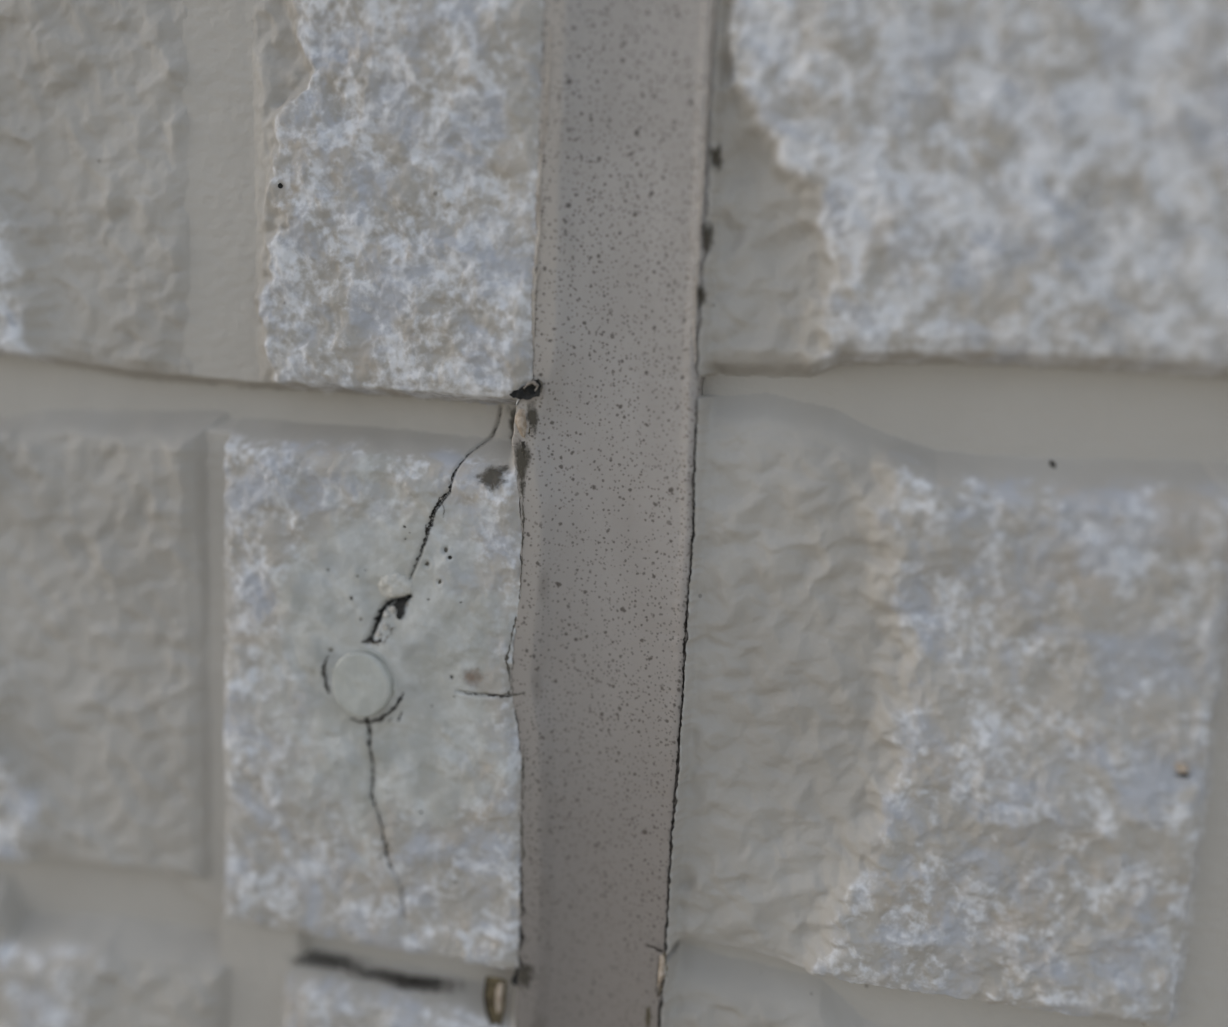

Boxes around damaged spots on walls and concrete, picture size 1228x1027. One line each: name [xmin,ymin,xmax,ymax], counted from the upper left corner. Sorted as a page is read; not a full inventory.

crack [409,407,502,580]
crack [463,456,525,698]
crack [664,423,697,951]
crack [655,1000,663,1027]